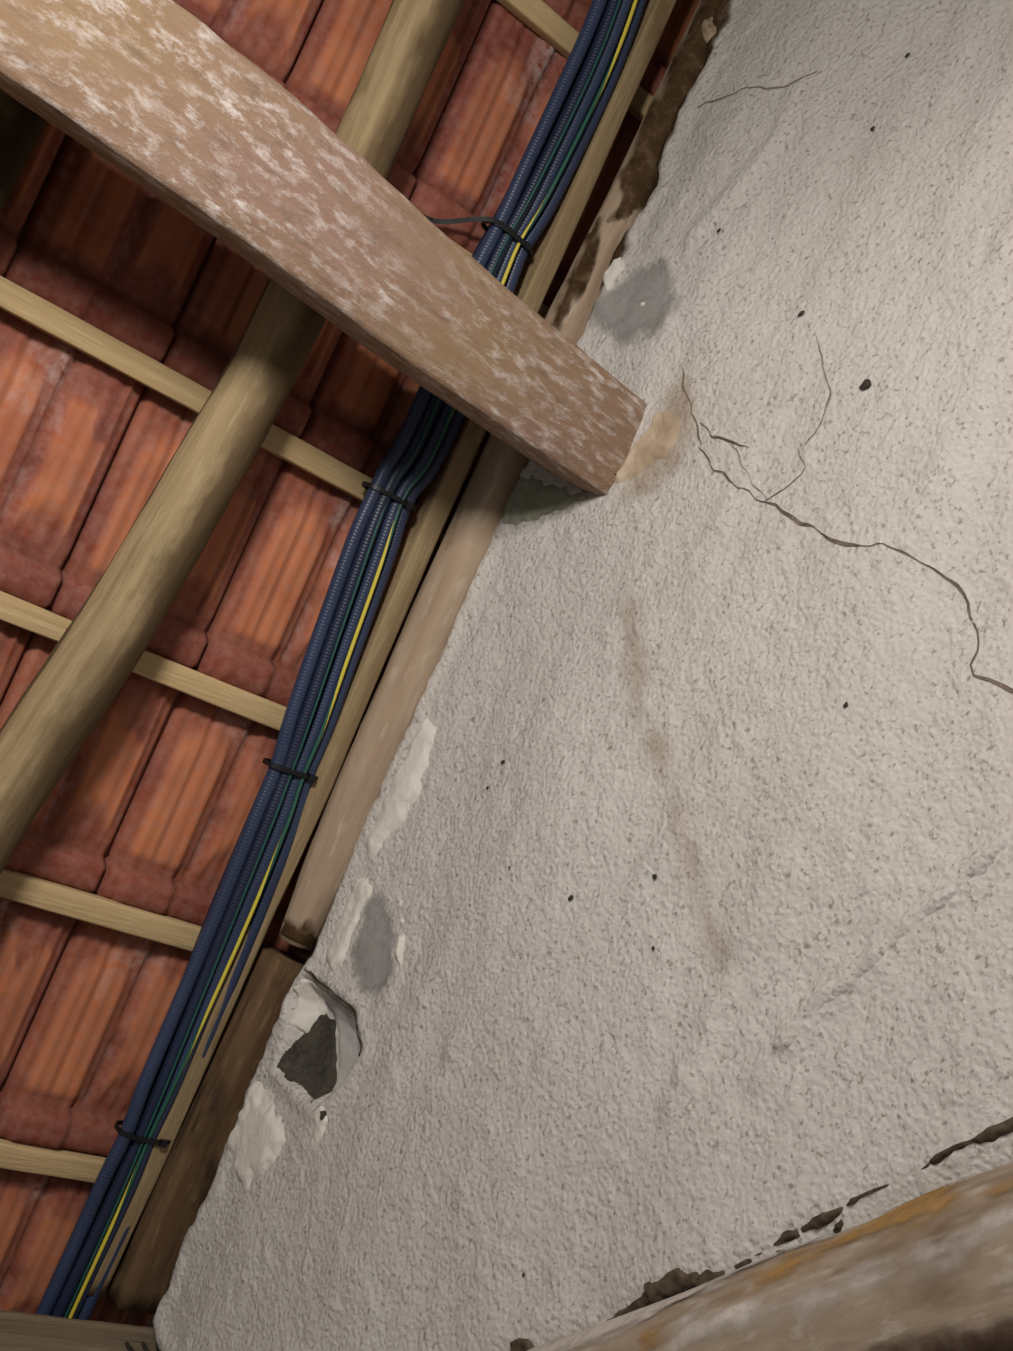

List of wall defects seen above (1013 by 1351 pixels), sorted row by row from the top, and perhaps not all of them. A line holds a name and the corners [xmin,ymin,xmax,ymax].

damp [553,0,731,329]
crack [682,336,1013,693]
damp [280,920,316,950]
spalling [277,877,405,1144]
peeling [758,1184,954,1282]